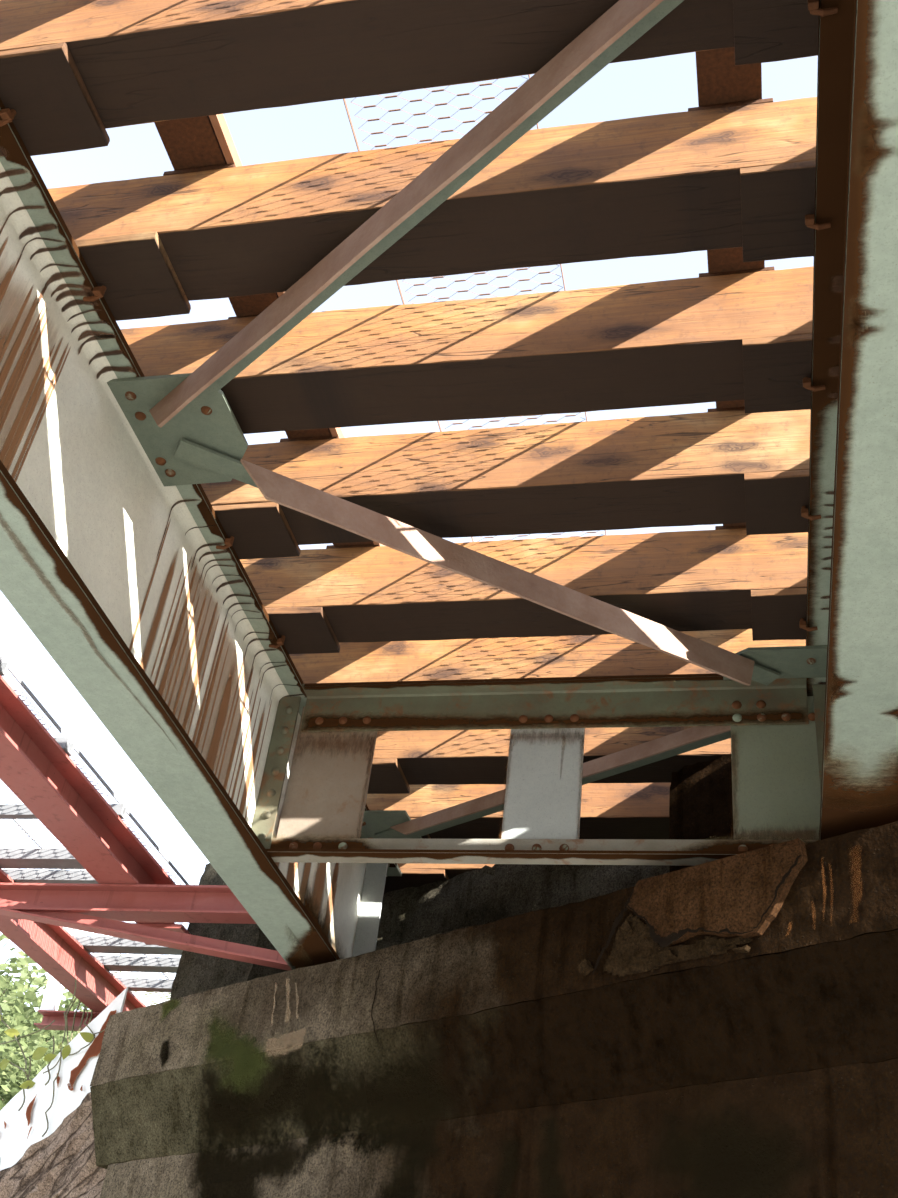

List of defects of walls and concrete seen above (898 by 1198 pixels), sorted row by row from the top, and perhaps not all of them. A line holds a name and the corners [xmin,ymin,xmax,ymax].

corrosion [0,98,145,432]
corrosion [802,0,898,845]
corrosion [0,339,815,970]
peeling [577,838,808,977]
corrosion [812,859,833,926]
damp [191,1044,453,1198]